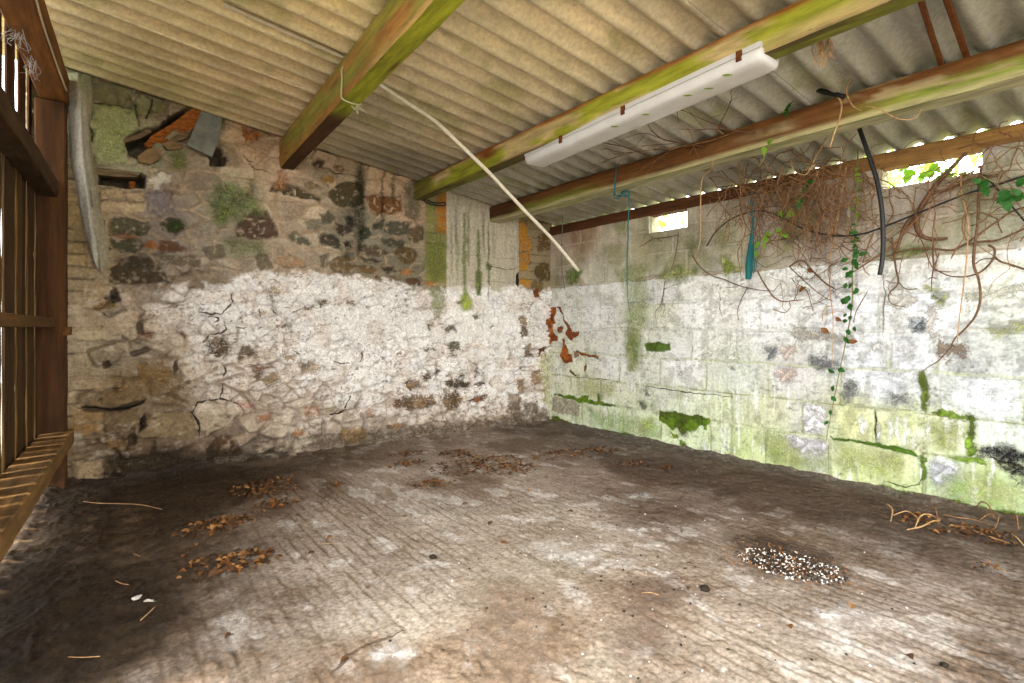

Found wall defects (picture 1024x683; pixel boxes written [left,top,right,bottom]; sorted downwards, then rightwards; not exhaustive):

leakage [451,214,491,295]
peeling [518,306,599,376]
crack [191,367,244,436]
leakage [842,379,857,403]
leakage [858,393,910,445]
leakage [977,442,1024,485]